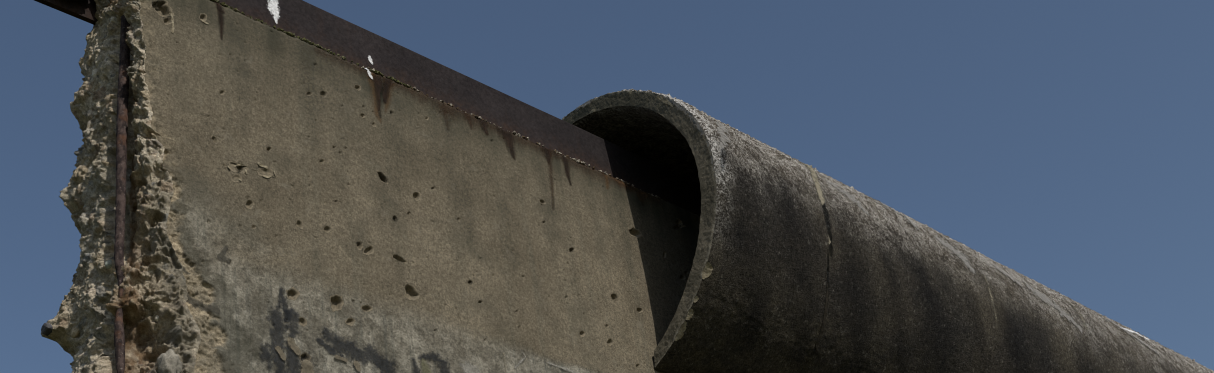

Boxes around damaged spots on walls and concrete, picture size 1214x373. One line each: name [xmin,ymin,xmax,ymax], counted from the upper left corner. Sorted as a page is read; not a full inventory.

spalling [41,0,220,373]